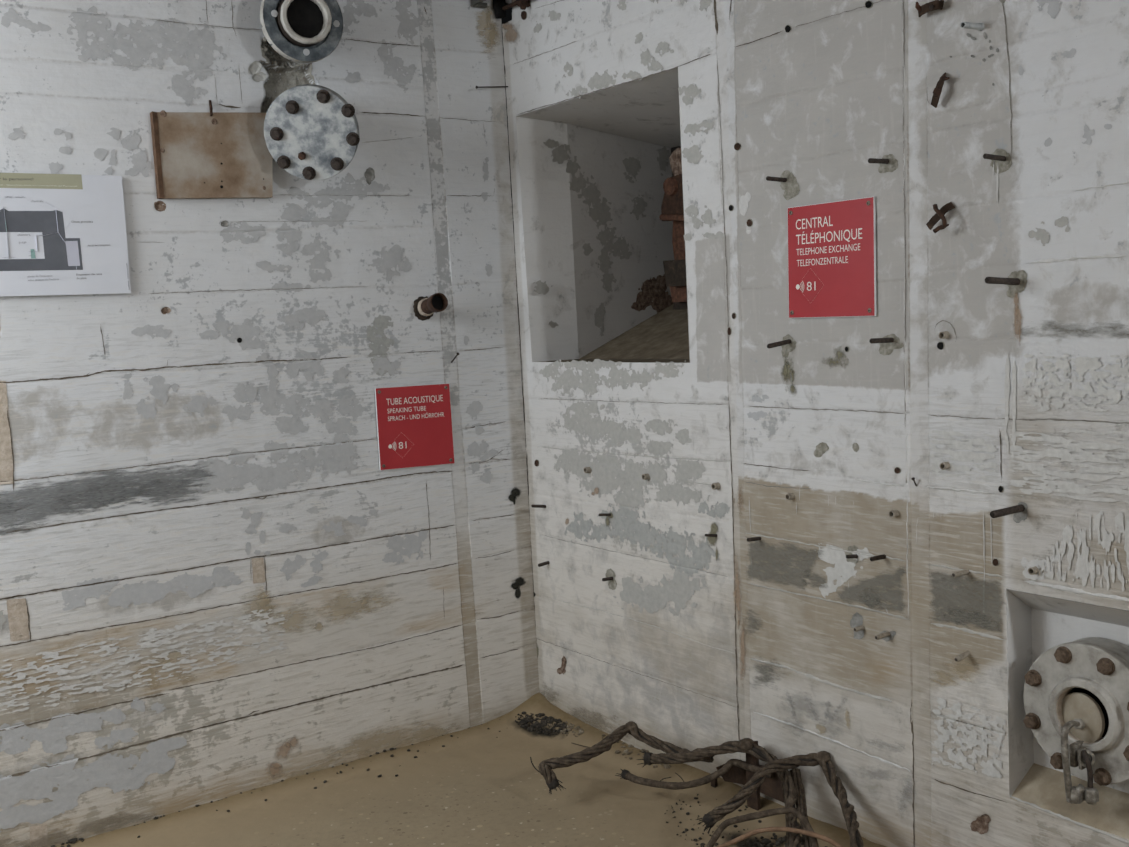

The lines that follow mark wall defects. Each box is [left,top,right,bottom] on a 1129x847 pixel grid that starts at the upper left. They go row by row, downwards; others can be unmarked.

peeling [67,6,230,107]
spalling [248,37,315,113]
rust [502,0,530,10]
peeling [220,167,390,293]
peeling [543,139,632,336]
spalling [631,274,674,313]
rust [1014,294,1022,342]
peeling [183,318,365,493]
peeling [539,359,730,616]
peeling [62,508,329,611]
peeling [1045,511,1129,592]
peeling [0,609,286,833]